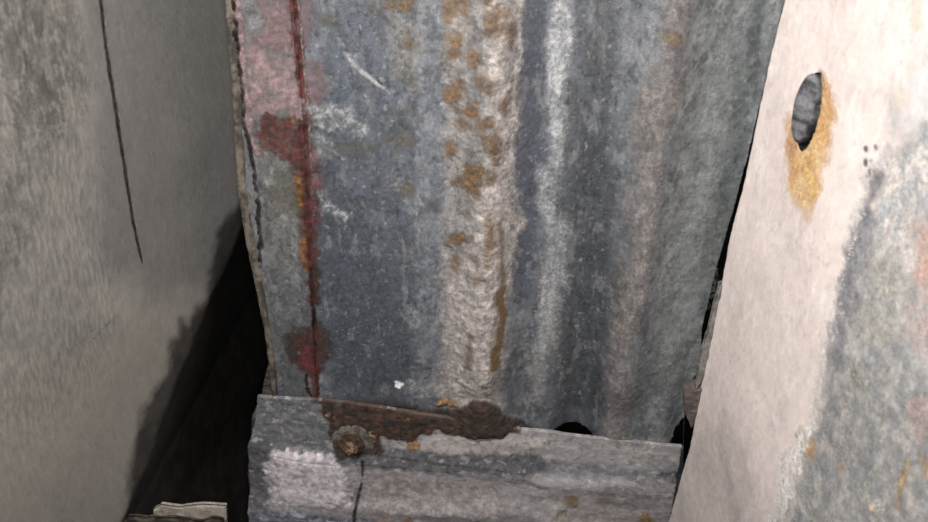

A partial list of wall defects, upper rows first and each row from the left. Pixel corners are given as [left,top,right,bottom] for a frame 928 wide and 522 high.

damp [3,0,75,102]
corrosion [445,33,496,94]
corrosion [483,0,516,48]
crack [99,0,142,263]
corrosion [225,0,321,396]
corrosion [444,79,501,195]
corrosion [786,82,836,219]
corrosion [490,273,507,371]
corrosion [283,322,463,460]
crack [352,455,498,522]